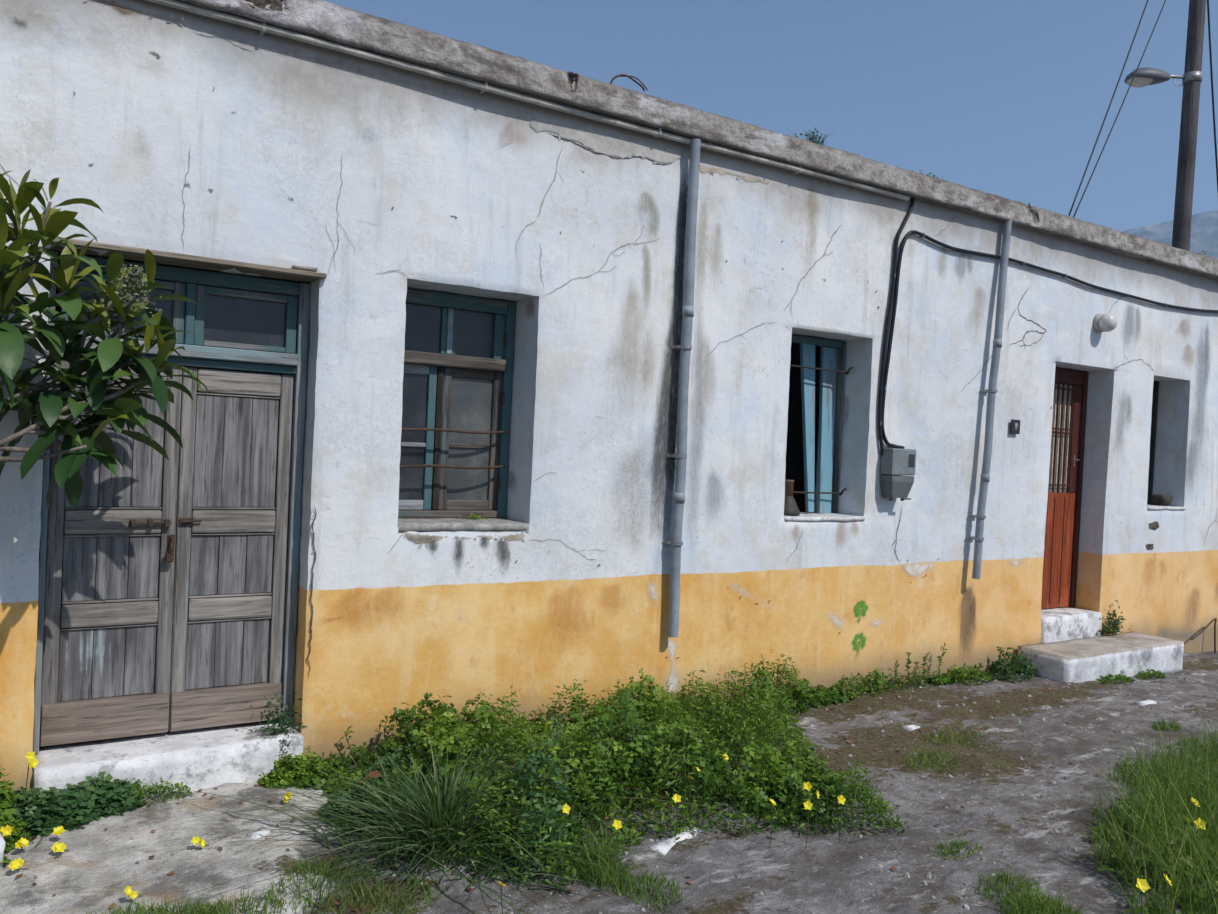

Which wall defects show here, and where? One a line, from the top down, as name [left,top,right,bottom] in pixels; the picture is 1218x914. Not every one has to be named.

spalling [245,0,288,11]
crack [325,153,355,275]
crack [516,148,656,295]
leakage [653,182,687,503]
crack [709,225,842,354]
crack [968,288,1047,384]
crack [307,506,317,674]
leakage [482,538,509,561]